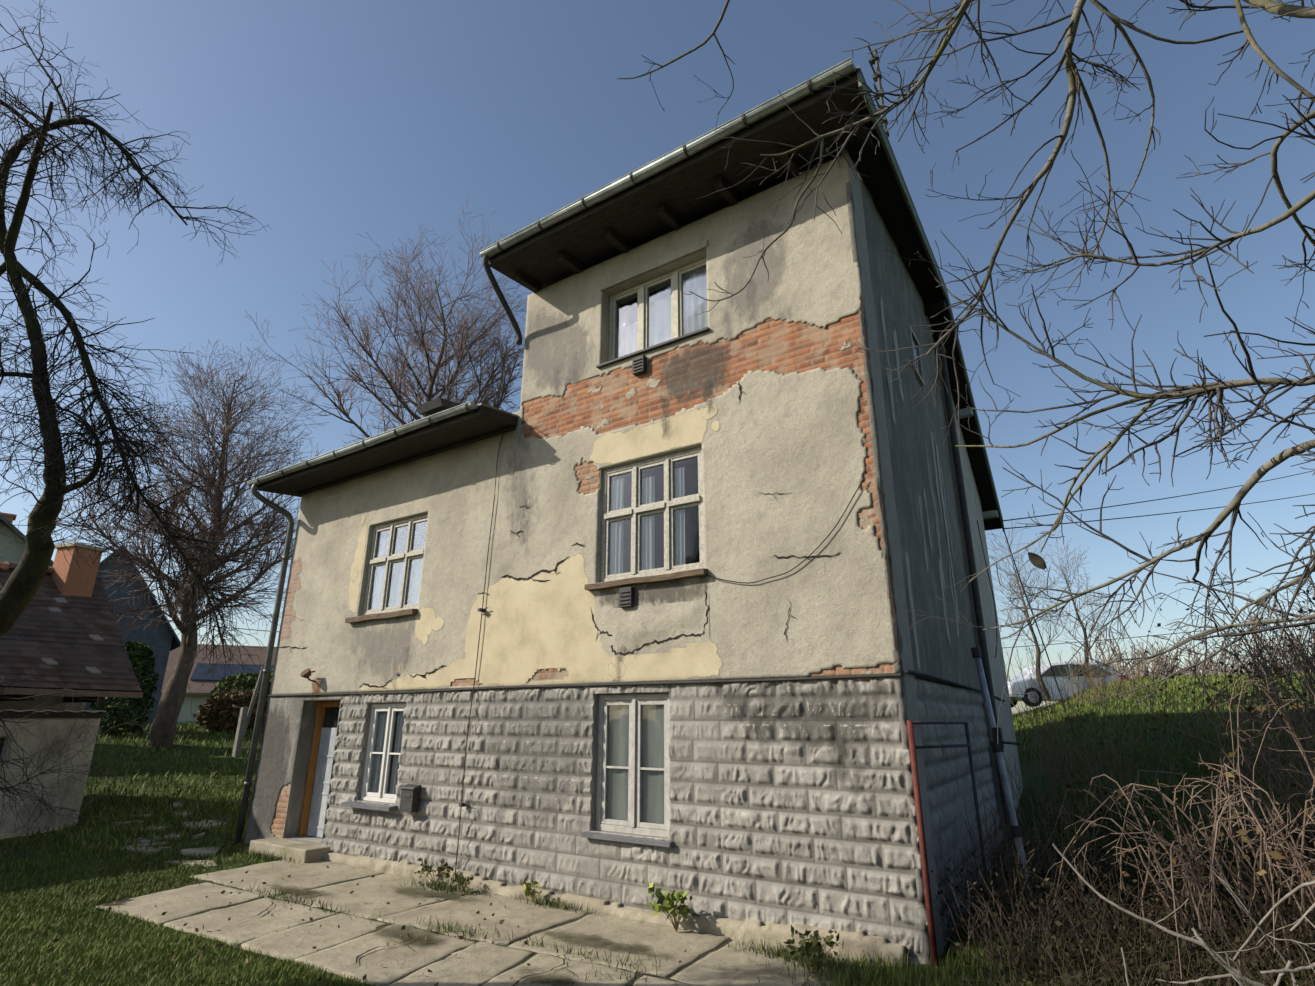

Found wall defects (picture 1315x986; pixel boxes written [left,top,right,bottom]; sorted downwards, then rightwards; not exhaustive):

spalling [521,307,898,622]
crack [477,542,586,616]
crack [591,584,709,655]
crack [358,665,445,688]